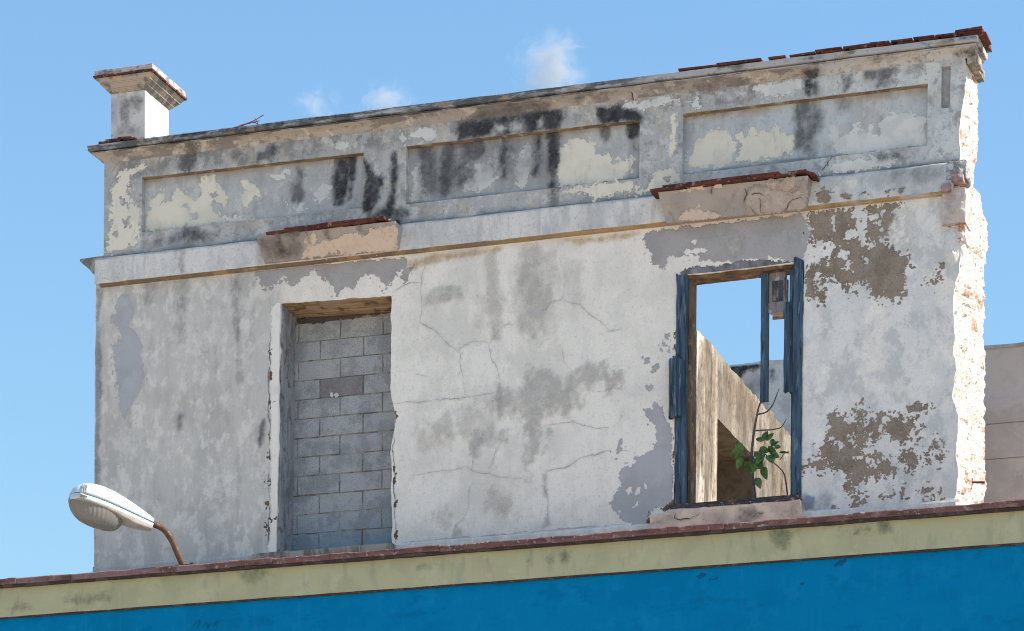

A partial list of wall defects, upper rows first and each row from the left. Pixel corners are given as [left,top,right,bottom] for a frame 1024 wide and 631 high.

peeling [102,163,262,256]
peeling [255,219,415,297]
water stain [332,152,408,225]
water stain [419,104,562,194]
water stain [596,105,642,139]
spalling [553,93,945,308]
water stain [795,57,820,152]
peeling [110,294,148,420]
crack [395,266,511,404]
crack [392,414,627,543]
peeling [609,330,676,525]
spalling [801,397,949,509]